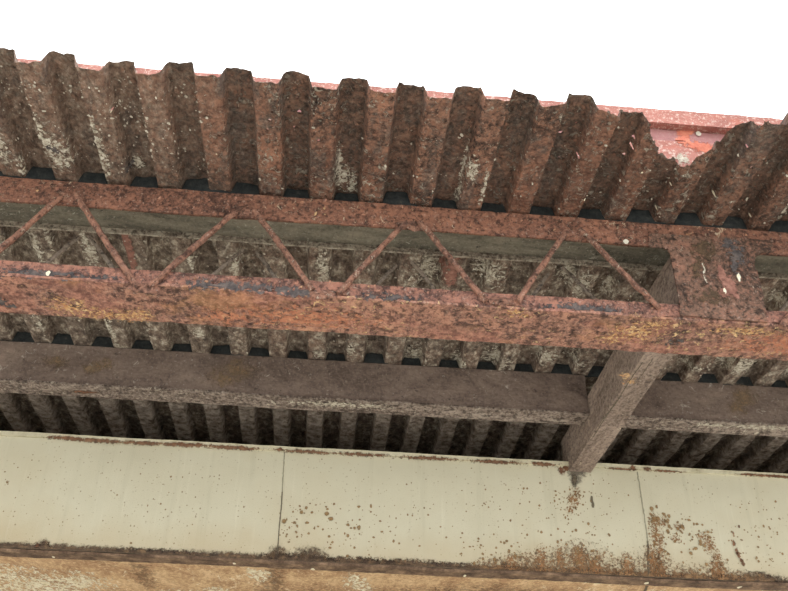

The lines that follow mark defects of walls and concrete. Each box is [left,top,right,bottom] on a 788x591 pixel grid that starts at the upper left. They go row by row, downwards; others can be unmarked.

peeling [674,130,713,167]
rust [43,296,155,323]
rust [188,303,390,331]
rust [597,317,686,347]
rust [279,502,400,557]
rust [460,483,784,582]